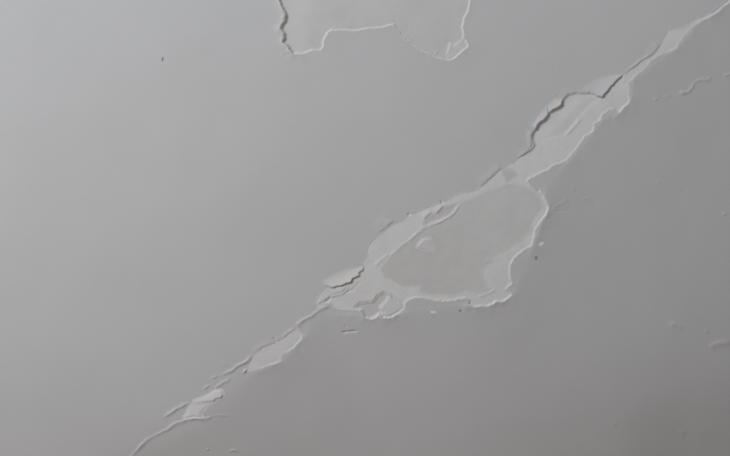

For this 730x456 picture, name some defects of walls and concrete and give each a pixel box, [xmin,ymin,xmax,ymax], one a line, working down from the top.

peeling [307,0,730,329]
peeling [240,322,310,378]
peeling [182,388,225,420]